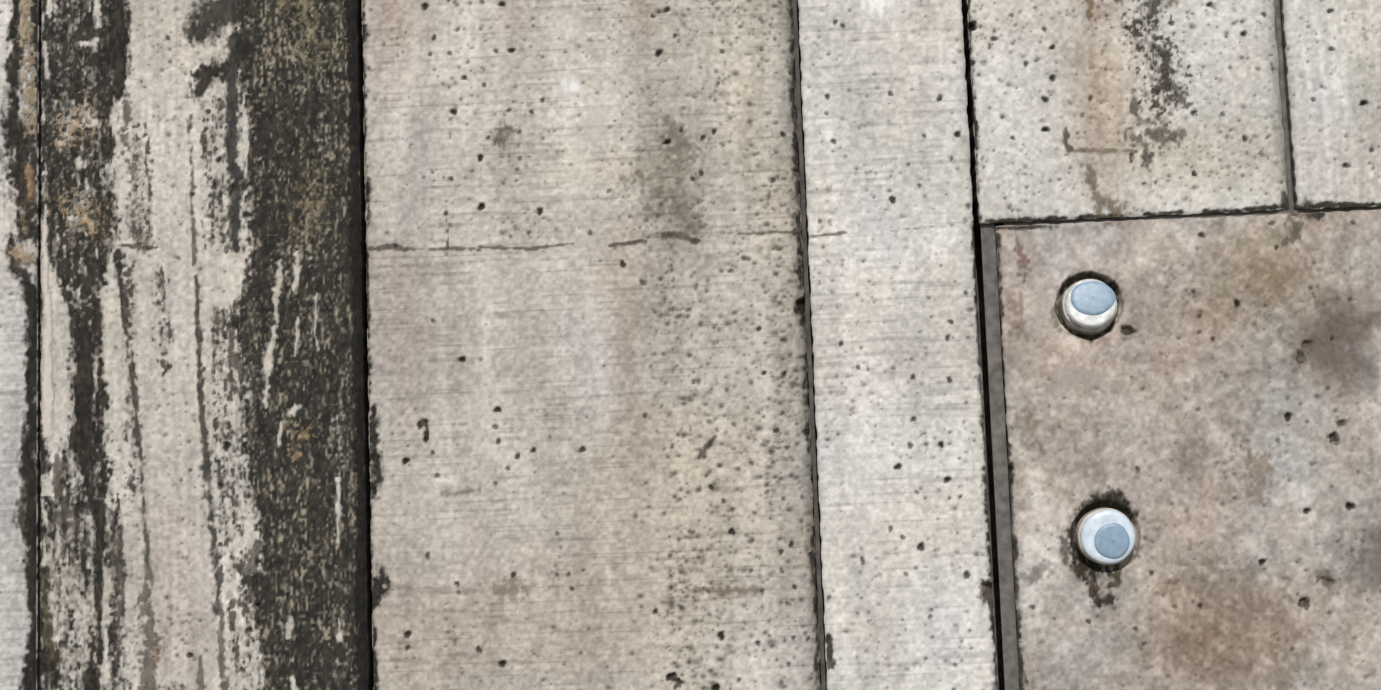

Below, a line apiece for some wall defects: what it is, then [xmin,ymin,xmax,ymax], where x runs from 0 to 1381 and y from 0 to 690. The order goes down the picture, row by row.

leakage [0,0,390,690]